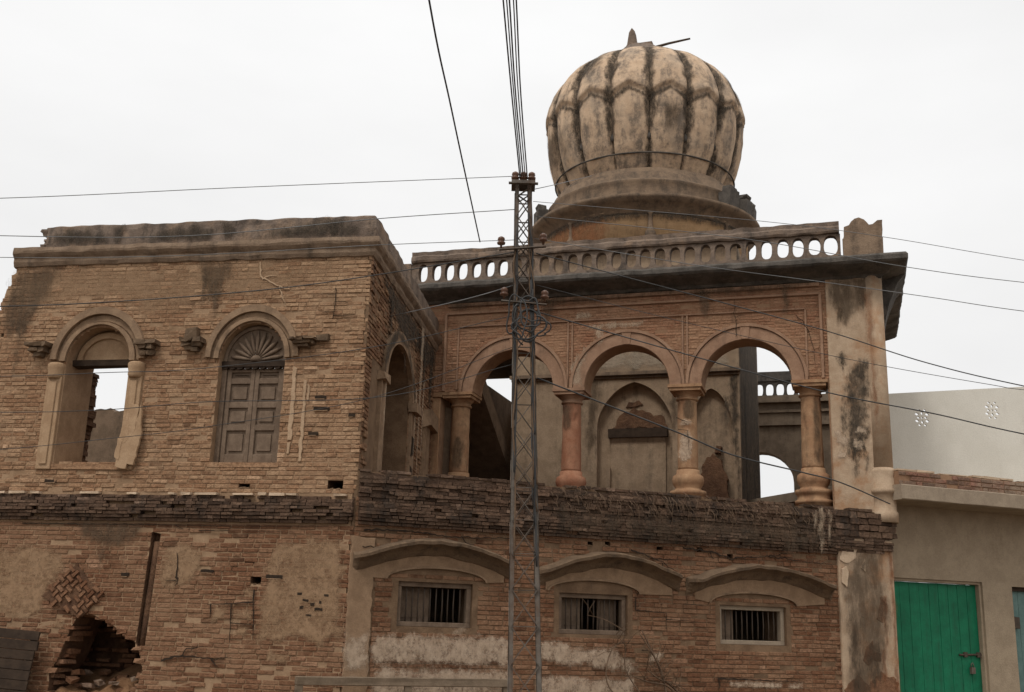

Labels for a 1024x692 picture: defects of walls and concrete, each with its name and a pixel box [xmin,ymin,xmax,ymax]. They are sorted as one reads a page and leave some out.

leakage [547,46,744,193]
crack [259,262,288,309]
leakage [839,353,869,471]
peeling [0,547,145,692]
peeling [160,543,214,588]
peeling [234,538,508,692]
peeling [541,642,634,692]